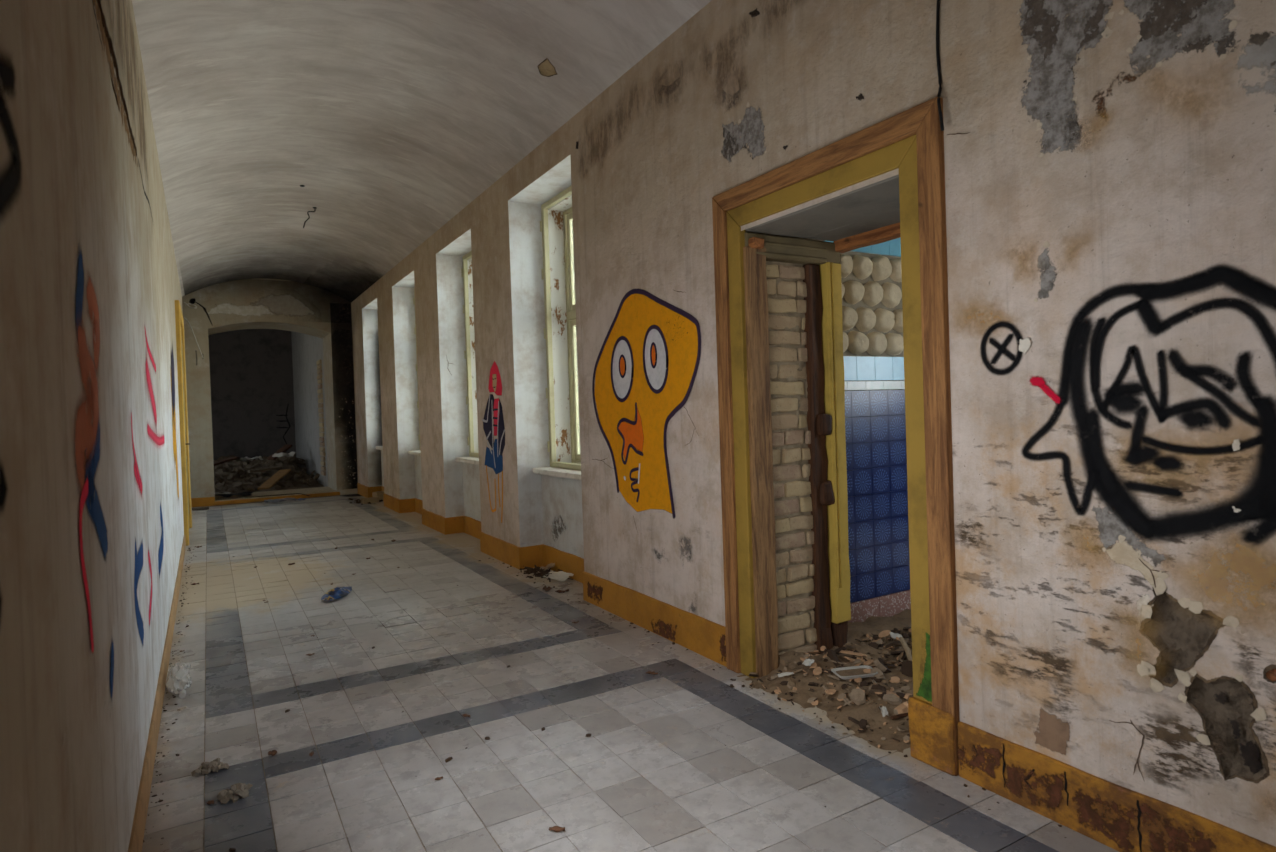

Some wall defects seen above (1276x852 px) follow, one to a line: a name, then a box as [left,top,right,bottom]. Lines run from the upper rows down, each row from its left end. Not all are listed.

spalling [538,58,558,77]
peeling [1016,0,1276,157]
peeling [719,103,767,162]
peeling [1034,241,1057,302]
leakage [1186,536,1276,619]
leakage [1000,648,1071,711]
spalling [1092,506,1270,783]
spalling [1263,664,1276,684]
leakage [1139,717,1221,786]